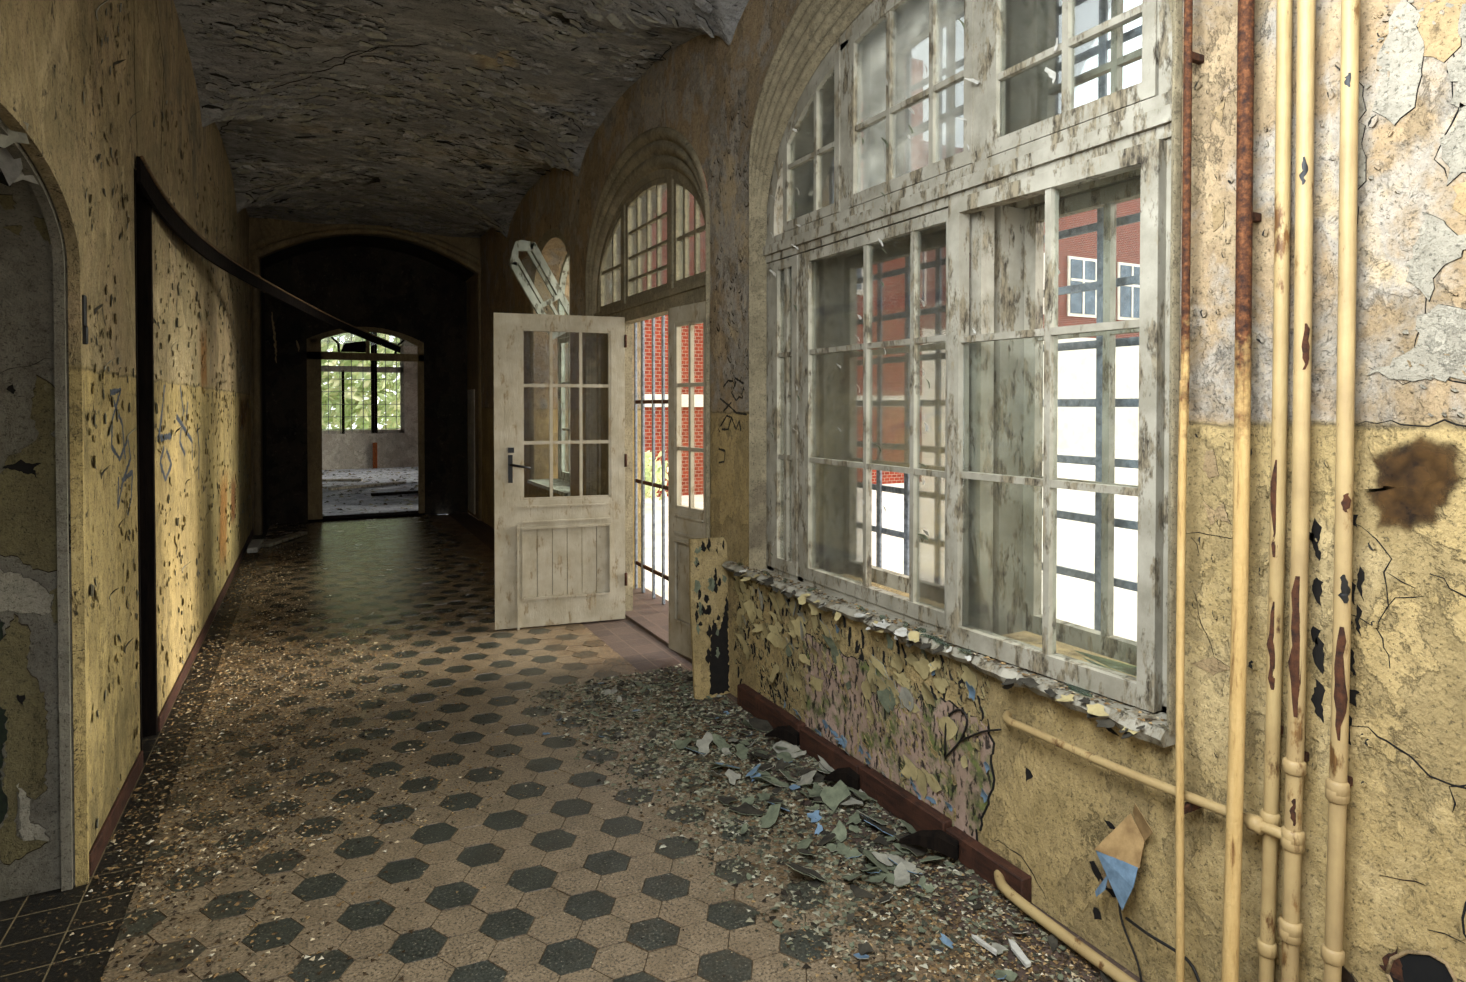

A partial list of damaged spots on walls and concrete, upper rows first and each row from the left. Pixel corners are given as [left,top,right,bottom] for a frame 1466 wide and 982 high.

peeling [1327,0,1466,418]
peeling [83,0,725,723]
crack [1369,297,1427,385]
crack [1354,419,1466,427]
water stain [1366,437,1460,531]
peeling [1248,518,1378,748]
crack [1351,524,1466,668]
peeling [542,537,996,959]
crack [1350,725,1466,812]
peeling [1089,803,1153,920]
spalling [1379,947,1458,982]
crack [1429,901,1466,944]